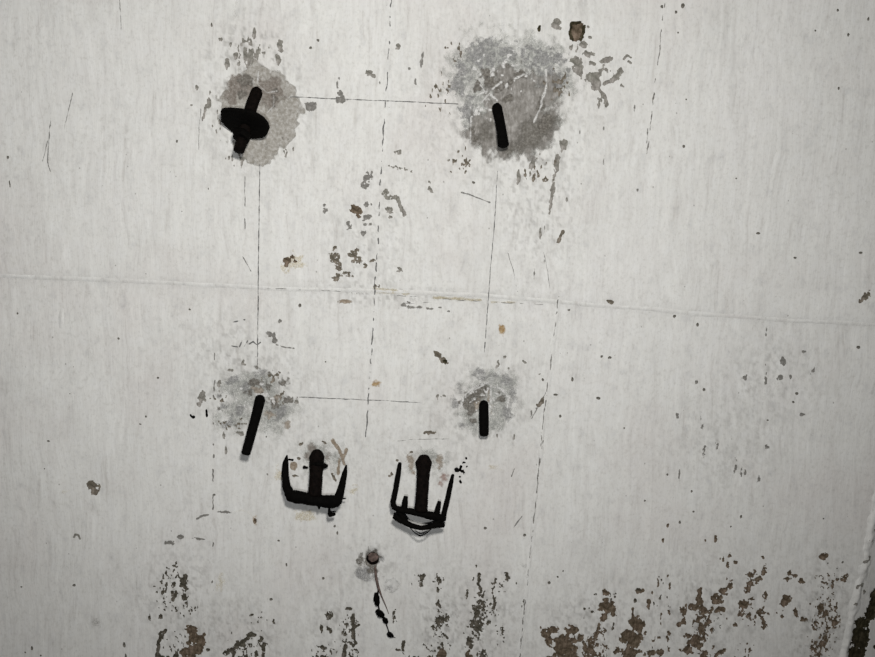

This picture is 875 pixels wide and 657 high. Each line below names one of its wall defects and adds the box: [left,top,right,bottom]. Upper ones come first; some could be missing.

peeling [148,561,210,657]
peeling [222,612,268,657]
peeling [311,607,360,657]
spalling [356,549,384,581]
peeling [395,573,451,657]
peeling [463,565,517,657]
peeling [540,552,849,657]
peeling [848,583,875,657]